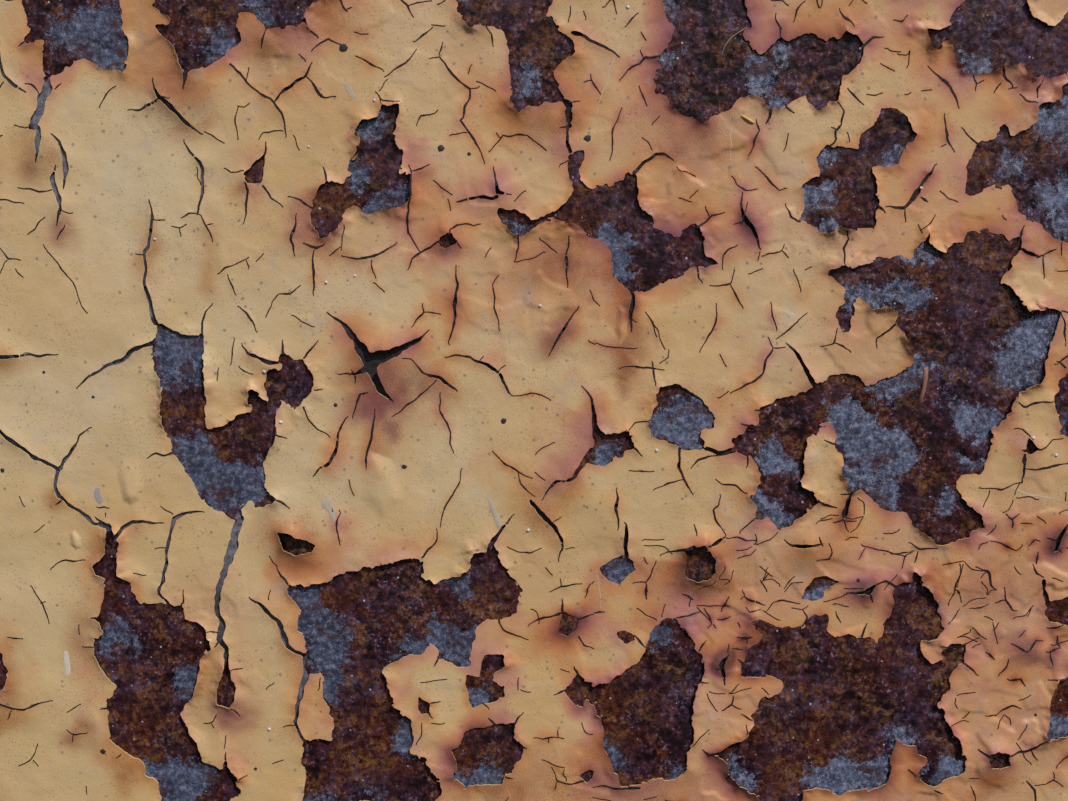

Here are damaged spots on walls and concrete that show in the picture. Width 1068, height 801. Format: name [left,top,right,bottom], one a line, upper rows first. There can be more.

crack [0,40,87,313]
peeling [91,530,241,801]
corrosion [155,69,187,97]
crack [206,512,244,671]
peeling [148,315,314,526]
corrosion [272,526,313,557]
peeling [287,537,523,801]
crack [76,0,899,559]
crack [483,442,668,801]
crack [614,401,1068,801]
peeling [718,572,966,801]
peeling [729,228,1060,545]